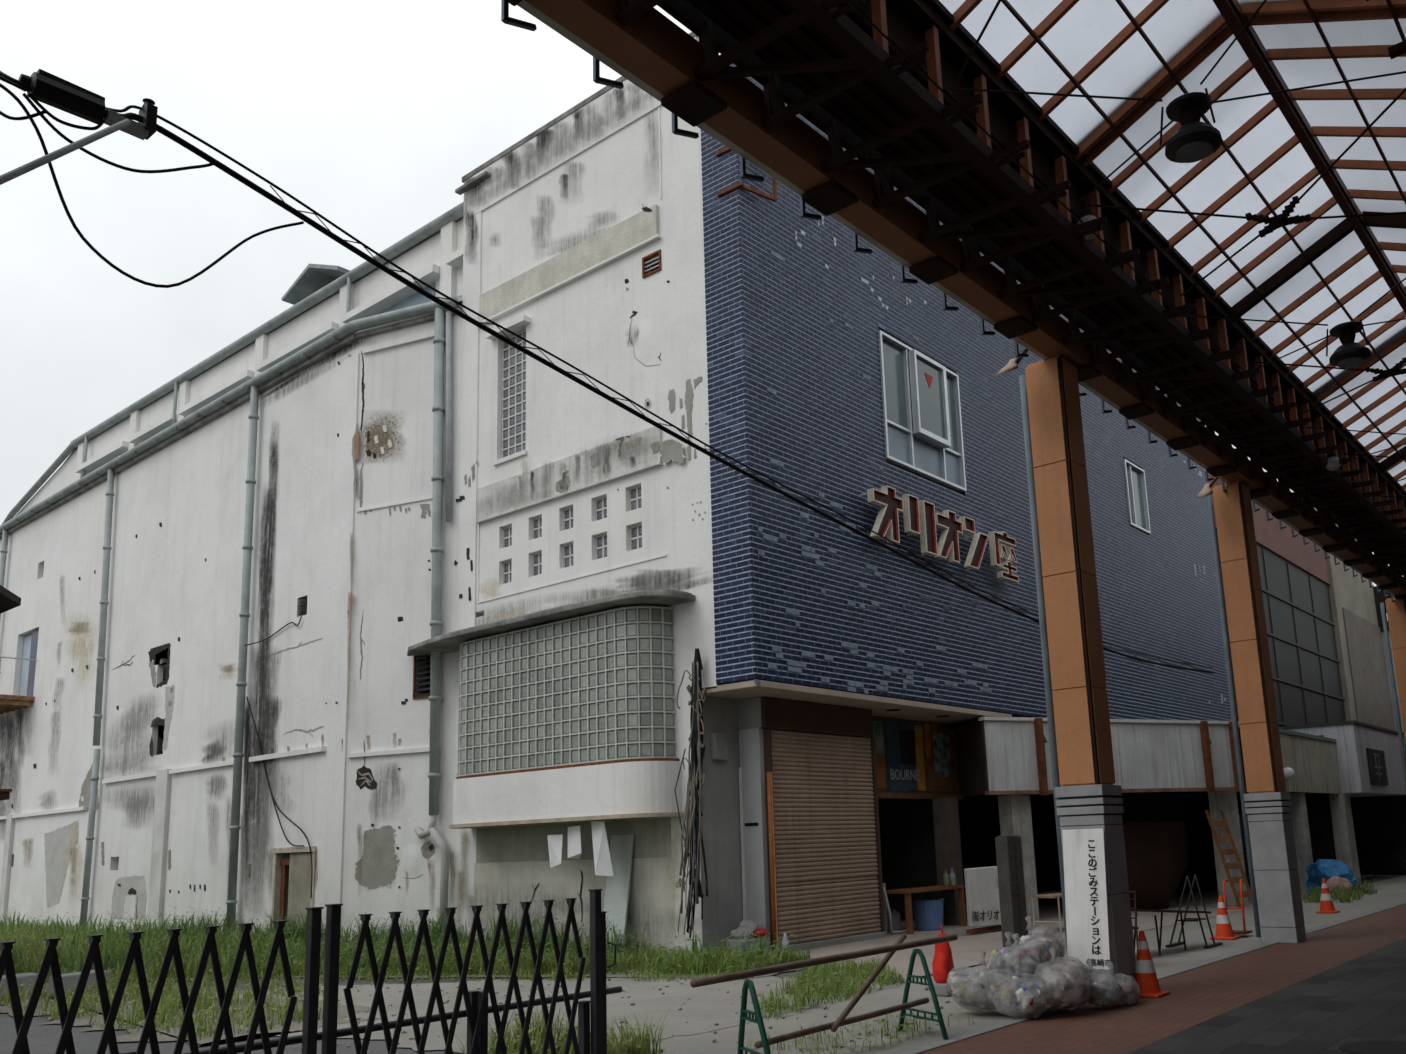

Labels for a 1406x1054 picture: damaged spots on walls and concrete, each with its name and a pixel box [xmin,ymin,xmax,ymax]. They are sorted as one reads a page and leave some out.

water stain [505,85,651,190]
water stain [465,178,481,251]
flaking render [337,417,401,464]
water stain [631,571,690,590]
water stain [212,432,283,871]
water stain [204,733,227,760]
spalling [356,747,377,790]
flaking render [44,763,99,909]
flaking render [354,824,401,890]
flaking render [110,874,147,920]